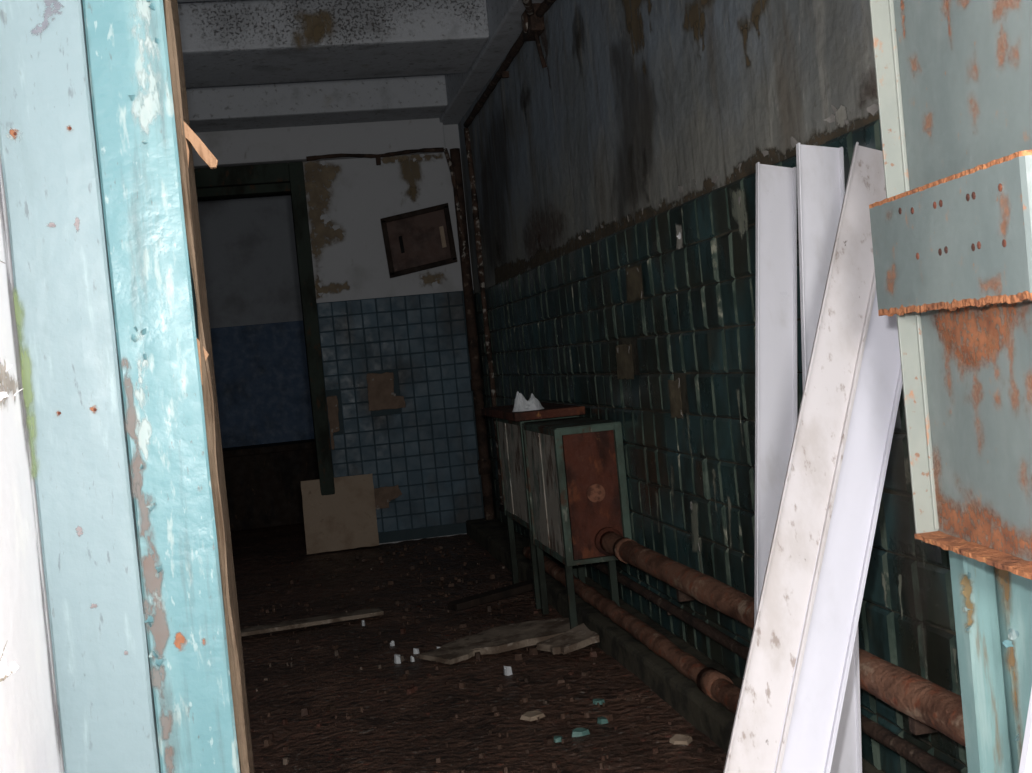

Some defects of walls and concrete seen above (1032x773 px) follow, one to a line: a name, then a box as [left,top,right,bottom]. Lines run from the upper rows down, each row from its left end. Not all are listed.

peeling [304,161,350,299]
peeling [131,326,150,342]
peeling [367,372,406,411]
rust [934,300,1027,405]
peeling [122,354,174,773]